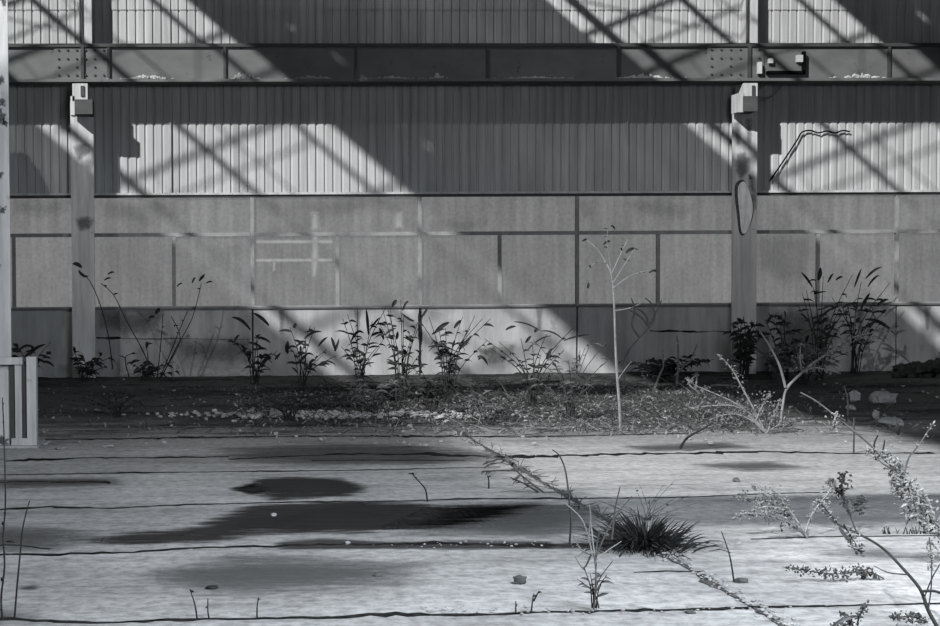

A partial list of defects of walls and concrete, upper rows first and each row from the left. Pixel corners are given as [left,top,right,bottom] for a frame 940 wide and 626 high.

leakage [0,477,620,591]